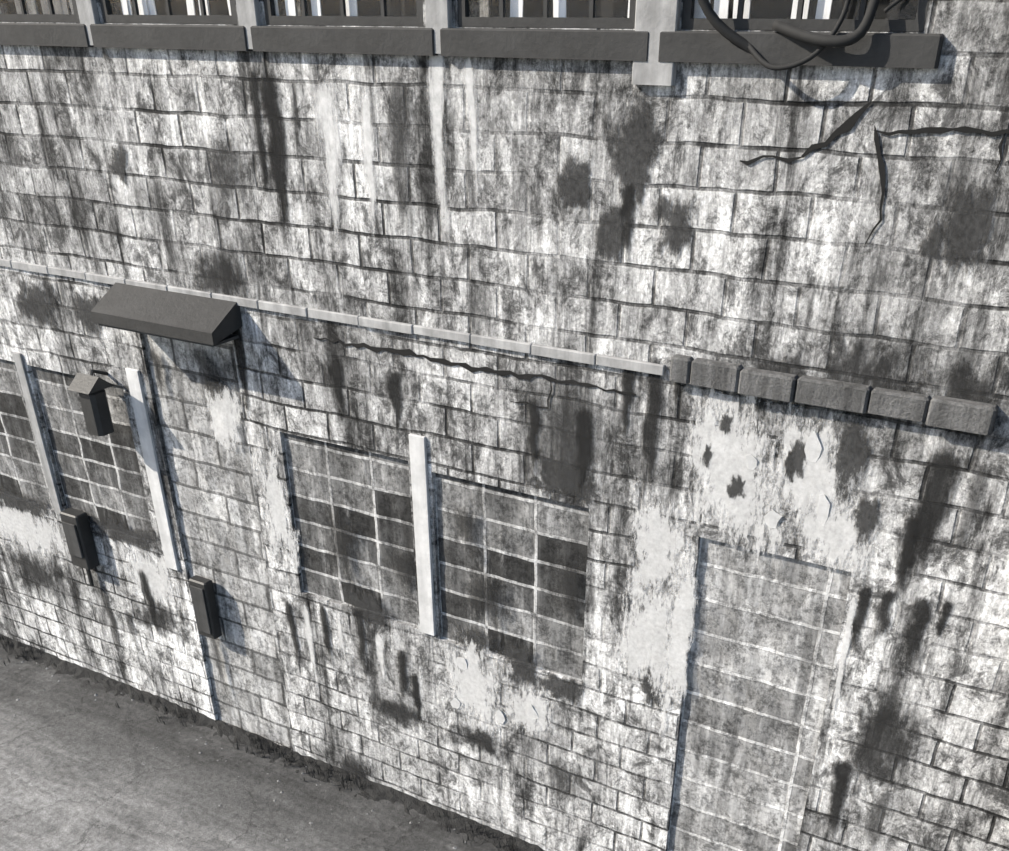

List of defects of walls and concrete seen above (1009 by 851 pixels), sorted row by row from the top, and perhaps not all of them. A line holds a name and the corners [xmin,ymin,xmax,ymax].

damp [189,329,248,409]
damp [527,397,600,506]
damp [621,361,680,481]
damp [4,547,80,601]
damp [127,571,185,638]
damp [285,601,345,676]
damp [353,609,384,675]
damp [365,651,420,728]
damp [446,725,508,763]
damp [553,764,572,792]